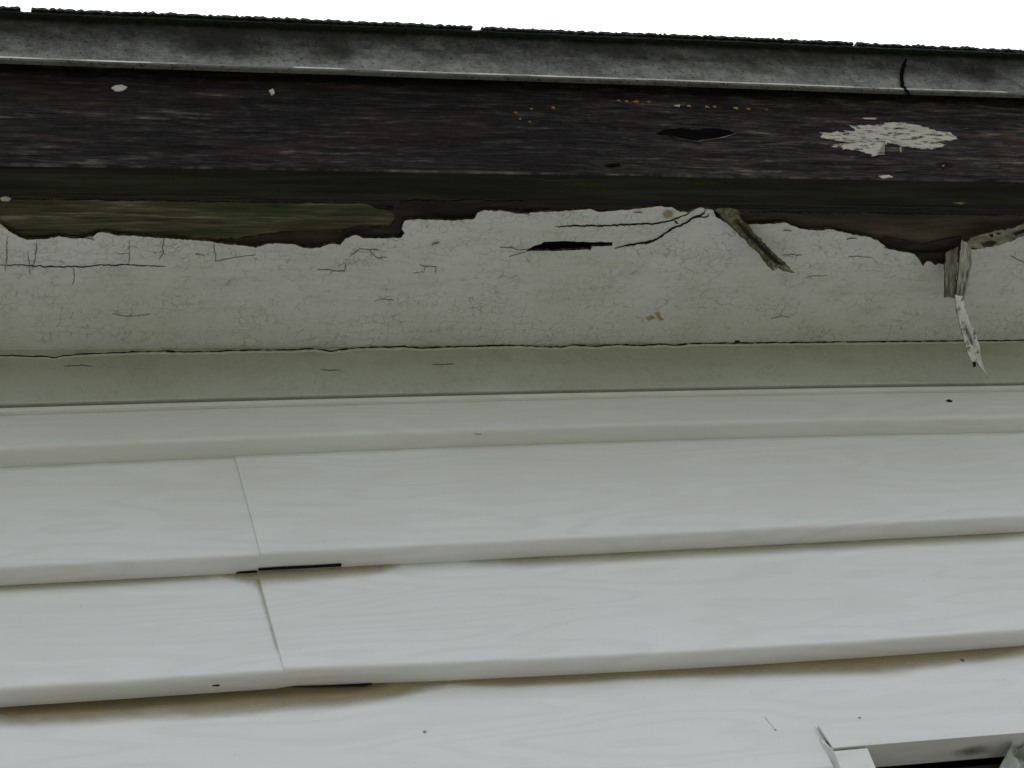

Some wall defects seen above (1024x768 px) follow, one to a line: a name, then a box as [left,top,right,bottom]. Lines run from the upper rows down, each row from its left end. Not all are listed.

crack [899,58,912,99]
peeling [820,118,957,156]
crack [2,237,165,285]
crack [195,244,253,262]
peeling [0,196,562,246]
crack [317,248,387,274]
crack [555,208,709,249]
peeling [739,211,1024,266]
crack [0,310,1024,371]